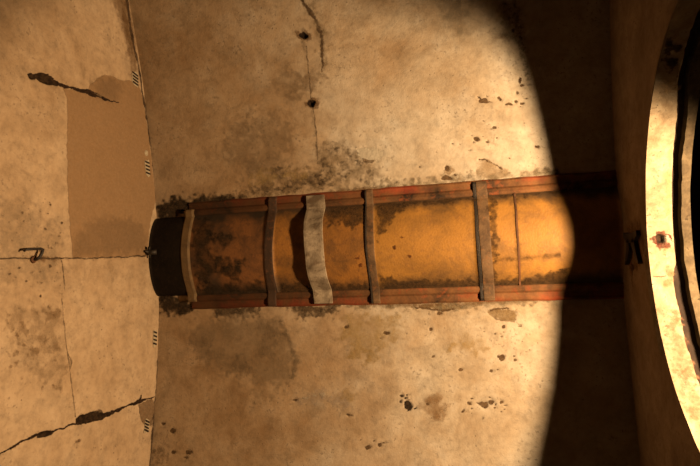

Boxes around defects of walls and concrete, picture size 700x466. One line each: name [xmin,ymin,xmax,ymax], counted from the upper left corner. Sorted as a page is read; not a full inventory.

crack [28,73,119,103]
crack [301,0,324,100]
damp [64,75,366,258]
crack [0,339,156,466]